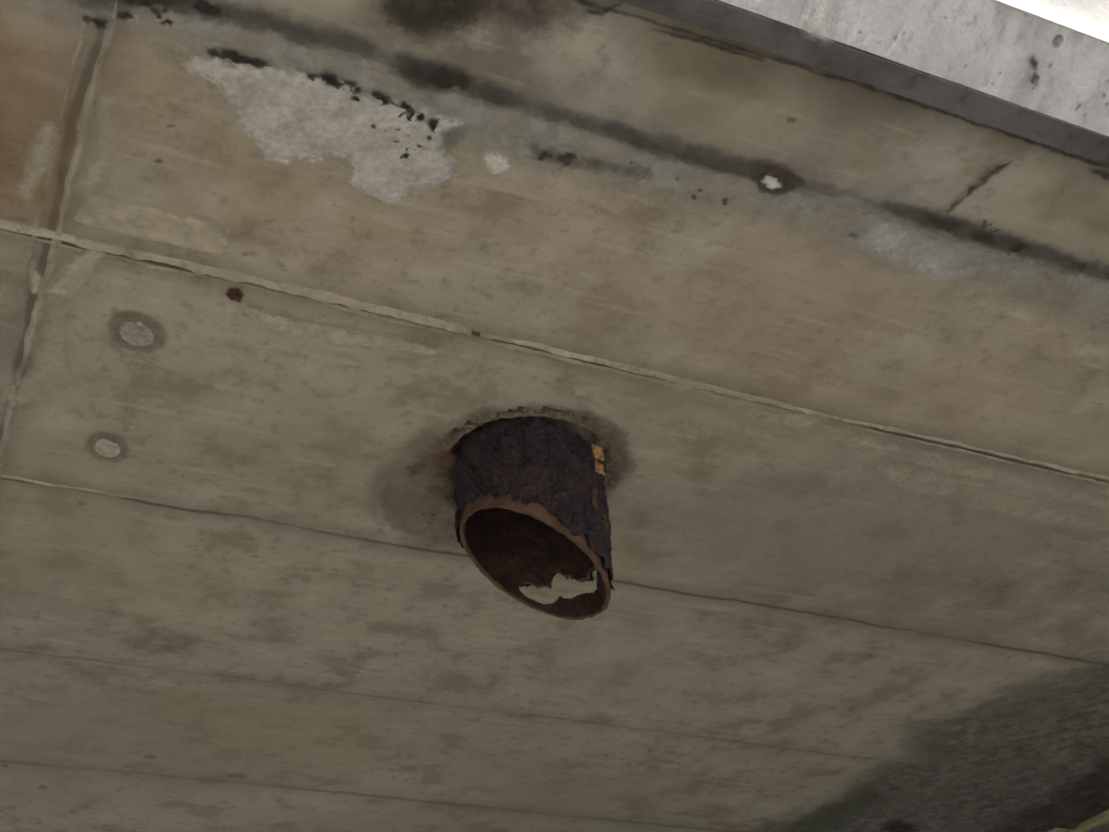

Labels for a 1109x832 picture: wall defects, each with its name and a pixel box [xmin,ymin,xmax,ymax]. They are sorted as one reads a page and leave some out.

peeling [188,56,464,203]
damp [61,0,787,200]
damp [722,189,1109,307]
rust [590,443,606,511]
damp [766,666,1109,832]